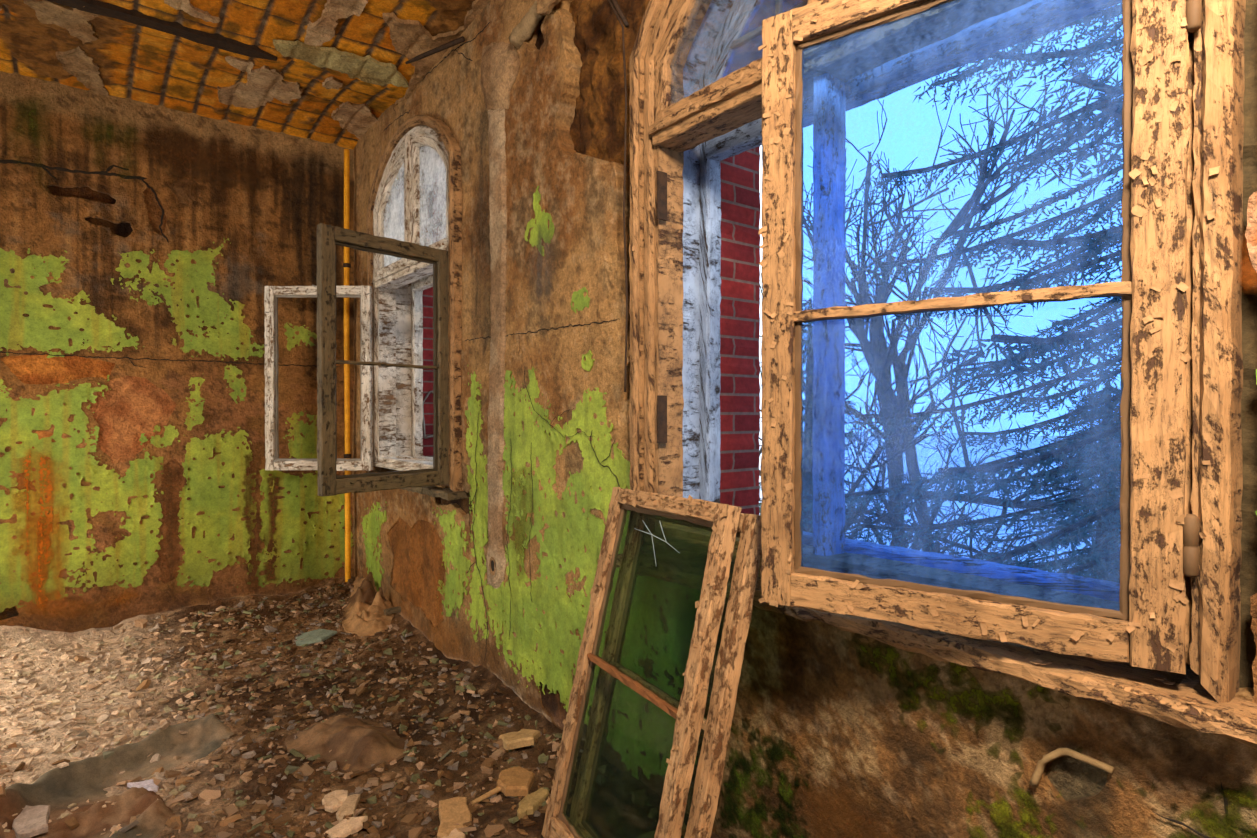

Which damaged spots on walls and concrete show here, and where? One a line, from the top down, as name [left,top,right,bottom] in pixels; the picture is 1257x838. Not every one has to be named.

crack [0,160,168,242]
water stain [145,129,340,286]
peeling [0,0,727,787]
peeling [958,622,1052,665]